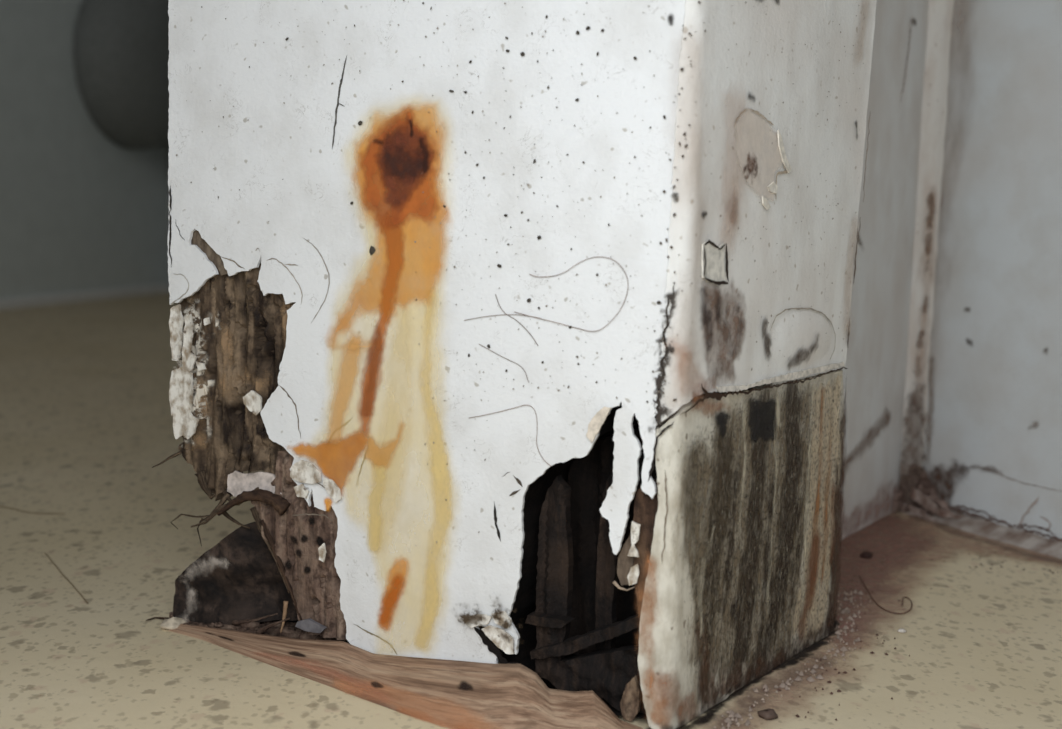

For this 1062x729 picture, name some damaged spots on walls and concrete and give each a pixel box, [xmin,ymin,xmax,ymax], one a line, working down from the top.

crack [853,111,871,284]
peeling [169,304,211,439]
peeling [243,390,262,415]
peeling [227,471,282,497]
rust [293,109,447,550]
rust [380,560,406,628]
rust [417,382,450,646]
spalling [458,403,658,722]
leakage [646,271,745,430]
crack [648,285,850,558]
leakage [788,337,818,367]
leakage [683,360,1062,729]